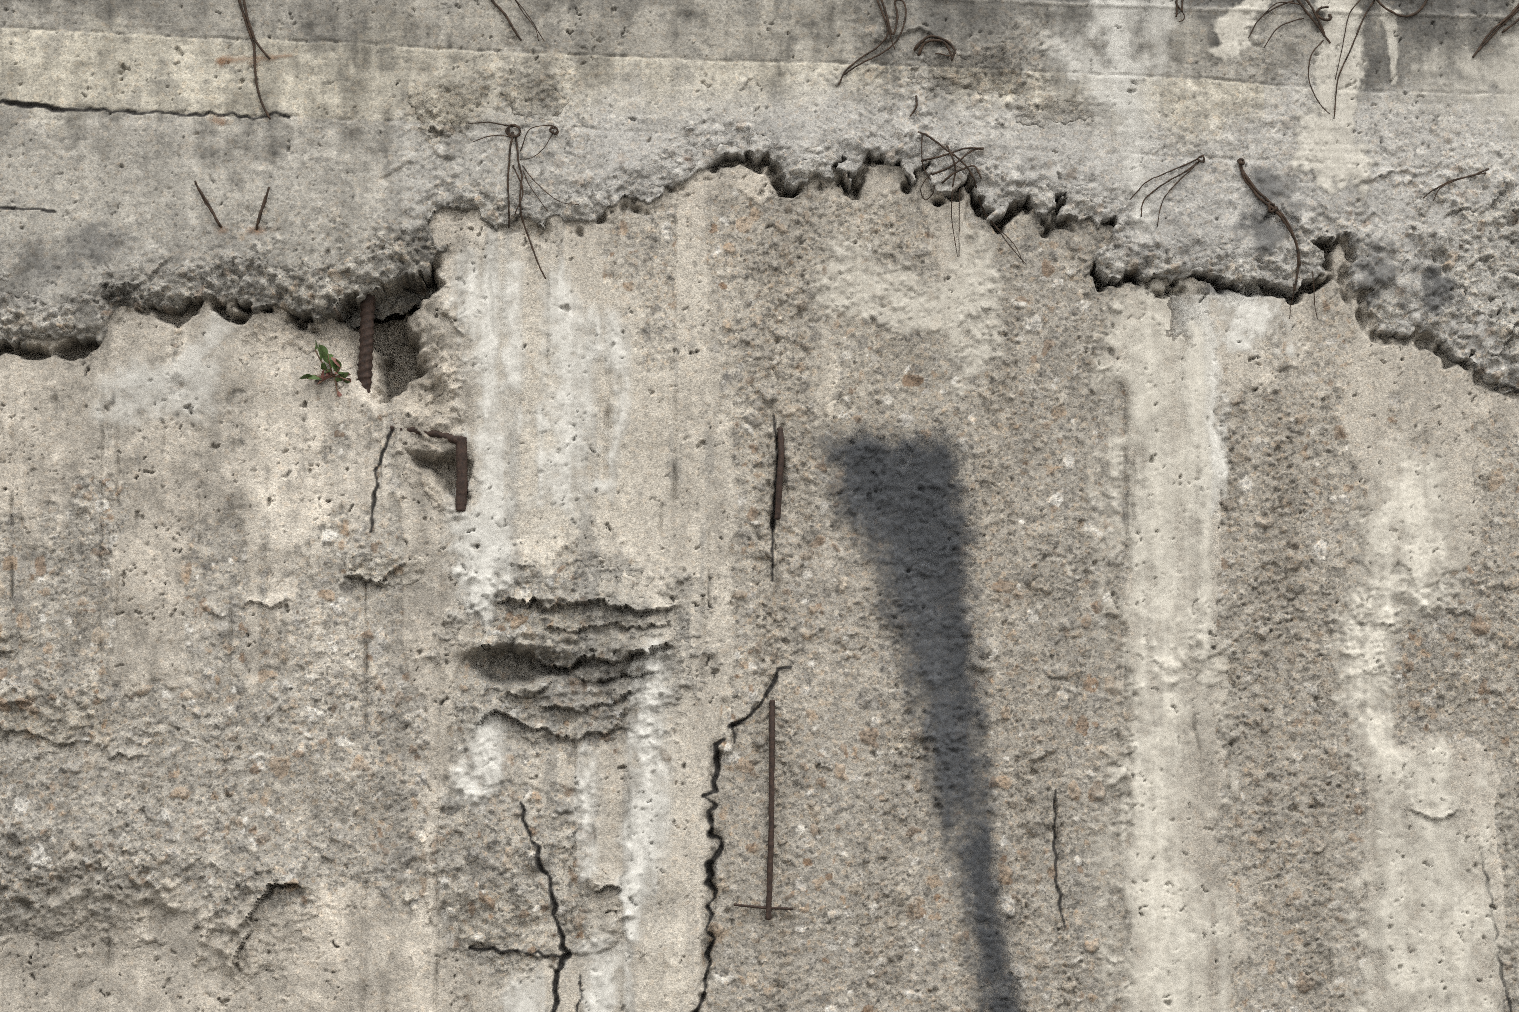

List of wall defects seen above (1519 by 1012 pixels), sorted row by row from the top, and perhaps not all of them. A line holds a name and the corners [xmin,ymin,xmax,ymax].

spalling [407,78,569,145]
spalling [907,41,1117,129]
leakage [1059,0,1151,230]
leakage [1209,0,1271,60]
leakage [1237,0,1519,252]
spalling [0,119,1327,523]
leakage [1356,253,1452,313]
spalling [1349,163,1519,384]
crack [770,415,778,581]
spalling [416,541,723,765]
crack [469,802,584,1012]
crack [693,666,792,1012]